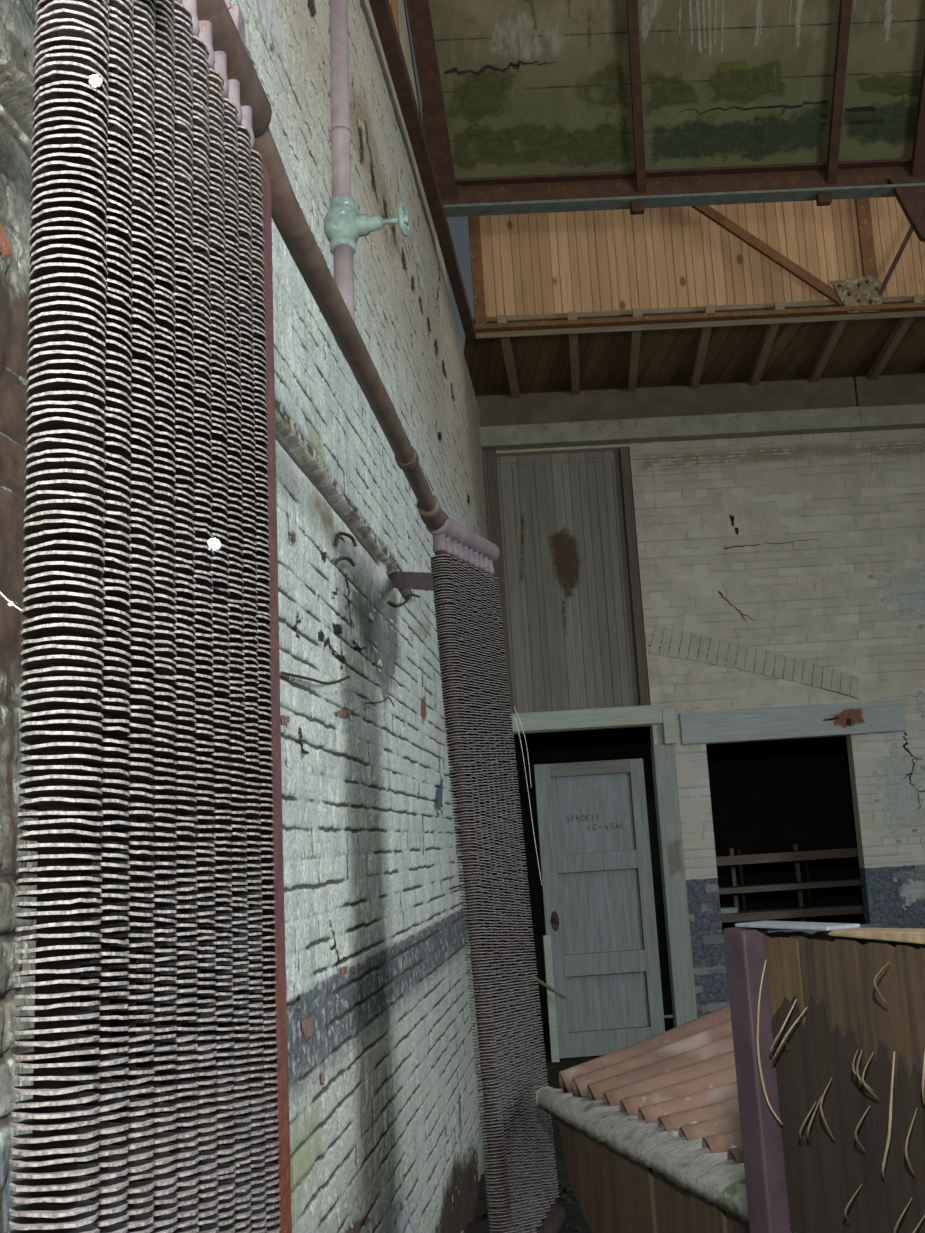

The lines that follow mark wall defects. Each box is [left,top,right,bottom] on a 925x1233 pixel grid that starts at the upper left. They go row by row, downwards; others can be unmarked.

leakage [679,0,724,55]
leakage [788,0,803,47]
leakage [884,0,893,42]
crack [444,60,556,76]
crack [679,100,827,115]
leakage [551,529,580,624]
corrosion [823,708,864,727]
crack [902,732,925,809]
peeling [893,877,925,910]